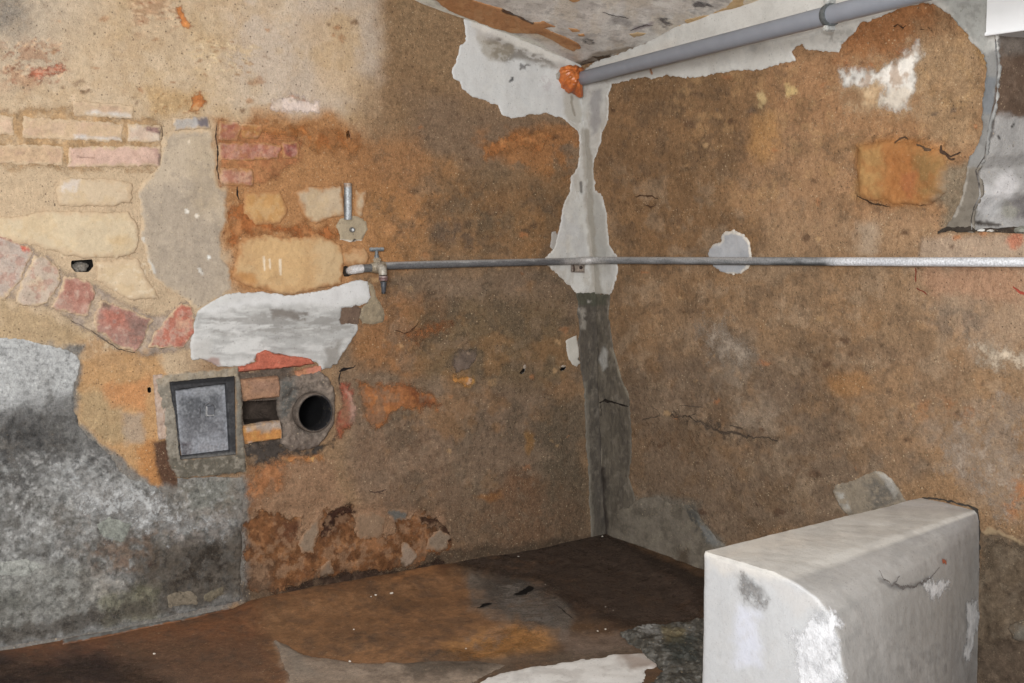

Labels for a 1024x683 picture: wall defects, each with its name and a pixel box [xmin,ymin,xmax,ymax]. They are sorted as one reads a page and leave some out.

efflorescence [839,40,924,112]
flaking render [0,92,371,376]
peeling [436,0,1002,570]
rust [335,381,441,438]
crack [599,399,777,441]
leakage [52,464,223,583]
crack [879,568,939,590]